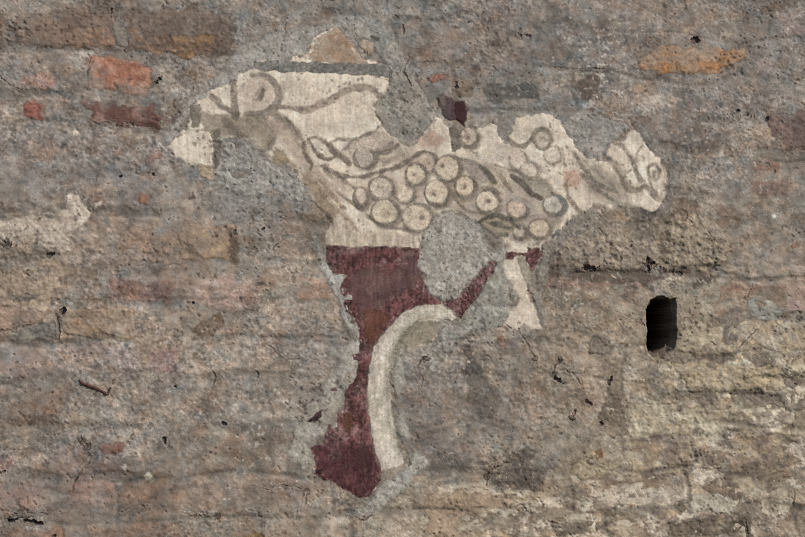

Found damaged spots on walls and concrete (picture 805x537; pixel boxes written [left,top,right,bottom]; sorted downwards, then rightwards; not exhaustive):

peeling [427,74,474,126]